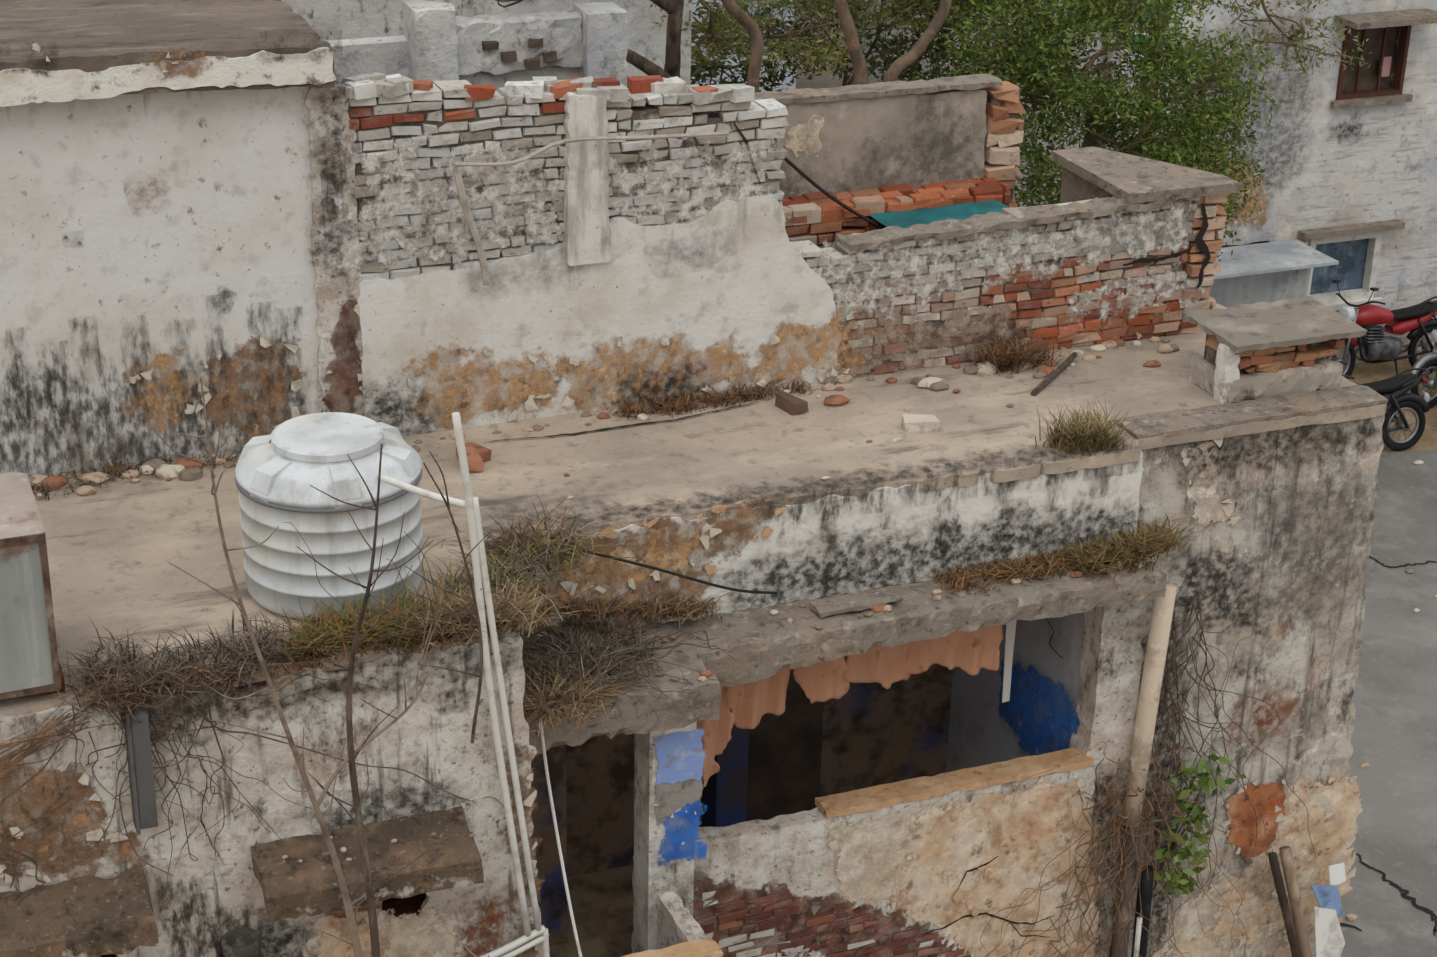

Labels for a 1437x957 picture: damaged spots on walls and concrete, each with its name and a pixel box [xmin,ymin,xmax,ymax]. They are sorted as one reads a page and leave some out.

flaking render [335,133,563,277]
flaking render [608,113,829,227]
damp [0,308,305,476]
flaking render [123,334,307,444]
flaking render [318,291,363,413]
flaking render [403,200,1205,428]
damp [491,445,1138,609]
flaking render [0,761,149,886]
flaking render [303,907,467,957]
flaking render [652,729,1101,957]
flaking render [1151,776,1363,957]